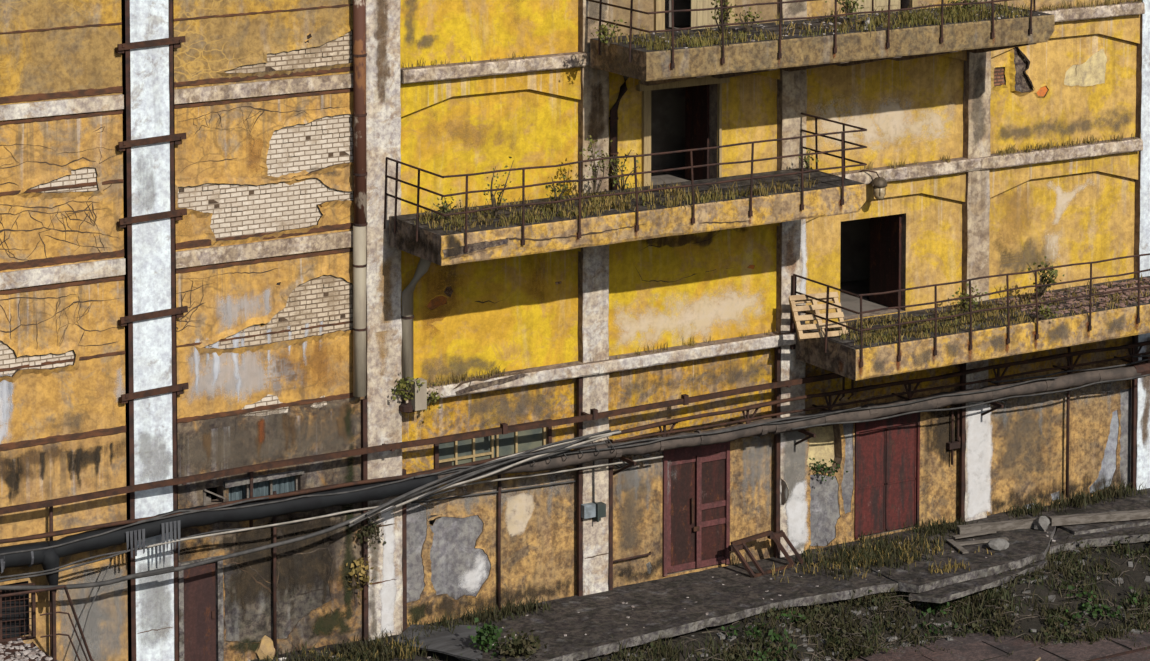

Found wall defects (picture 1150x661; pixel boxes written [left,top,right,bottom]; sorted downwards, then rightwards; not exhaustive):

flaking render [216,23,353,80]
flaking render [991,47,1049,98]
peeling [1062,47,1109,88]
crack [0,126,120,260]
flaking render [175,107,354,247]
flaking render [0,332,80,383]
crack [0,293,119,347]
flaking render [193,266,353,356]
damp [0,380,123,499]
peeling [784,423,855,549]
peeling [406,498,493,605]